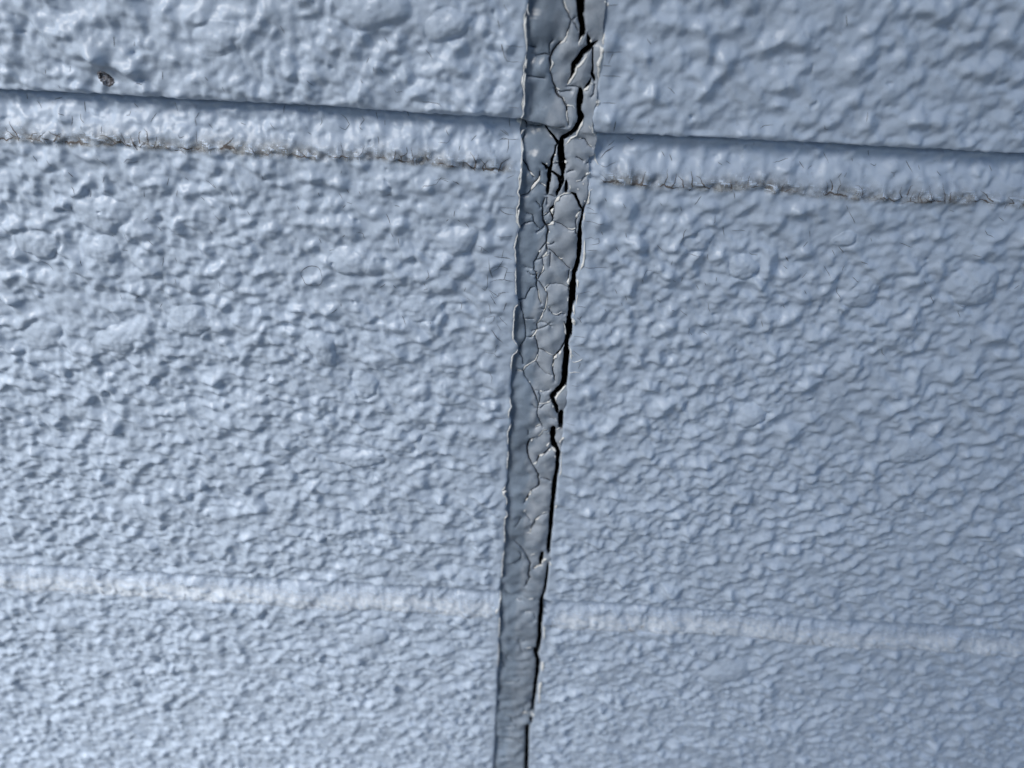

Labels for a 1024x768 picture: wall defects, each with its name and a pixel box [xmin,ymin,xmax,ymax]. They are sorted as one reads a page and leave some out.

crack [0,0,795,768]
crack [776,126,1024,298]